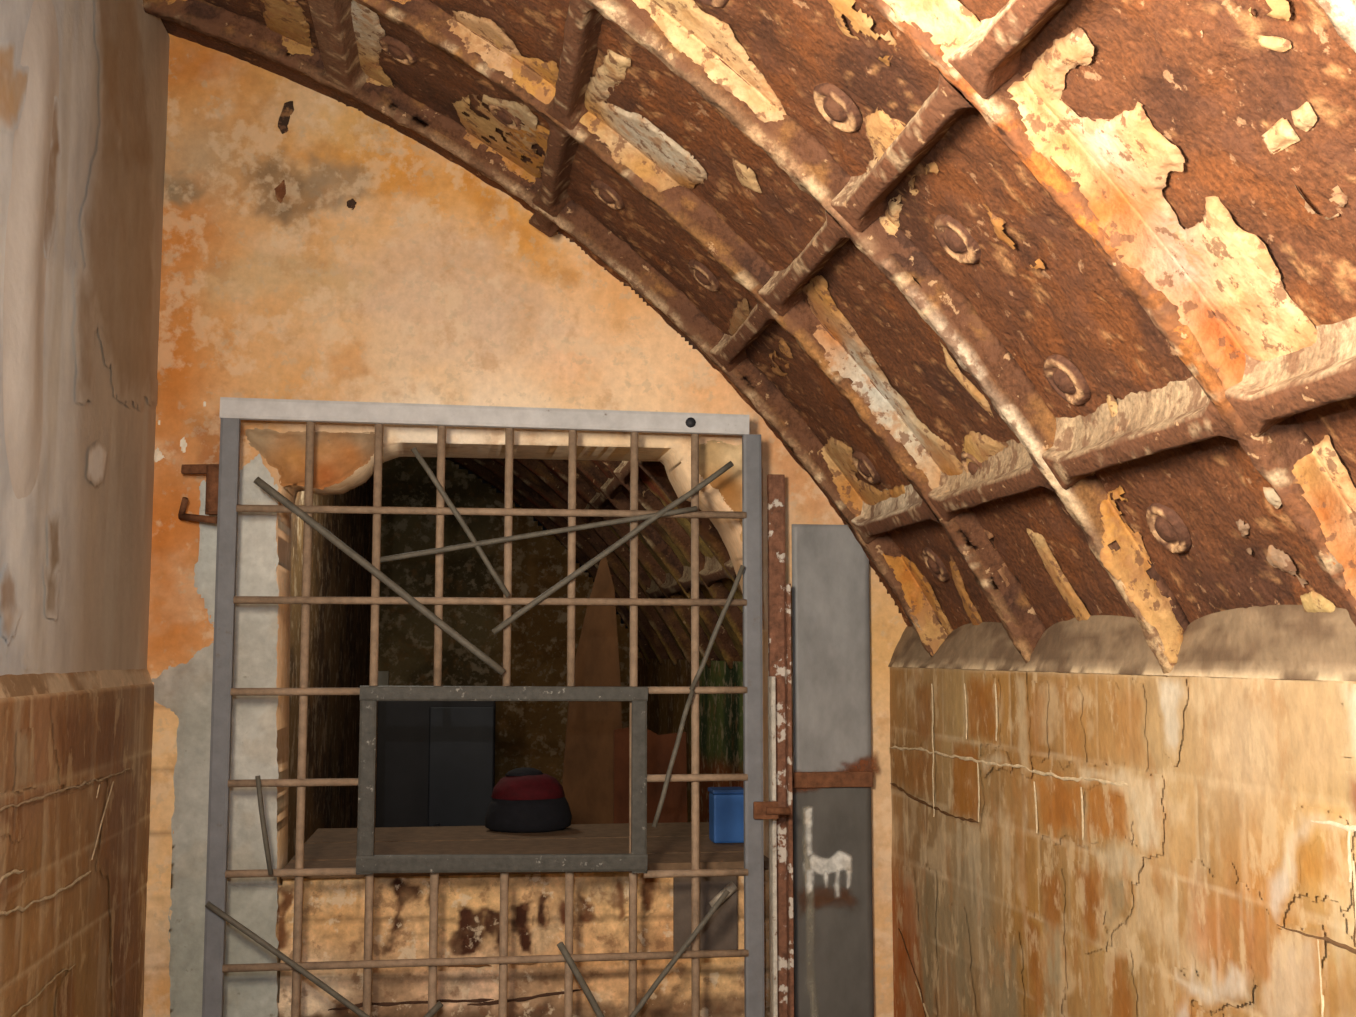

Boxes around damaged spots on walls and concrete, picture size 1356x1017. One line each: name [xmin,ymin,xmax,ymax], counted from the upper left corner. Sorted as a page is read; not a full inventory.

peeling [632,0,786,123]
peeling [827,0,982,68]
corrosion [257,119,593,291]
peeling [1007,27,1317,391]
corrosion [147,163,238,684]
corrosion [711,369,844,525]
peeling [1292,435,1356,609]
crack [0,768,131,916]
leakage [890,671,1188,946]
leakage [1171,804,1356,1017]
crack [1277,871,1356,954]
efflorescence [1334,683,1356,775]